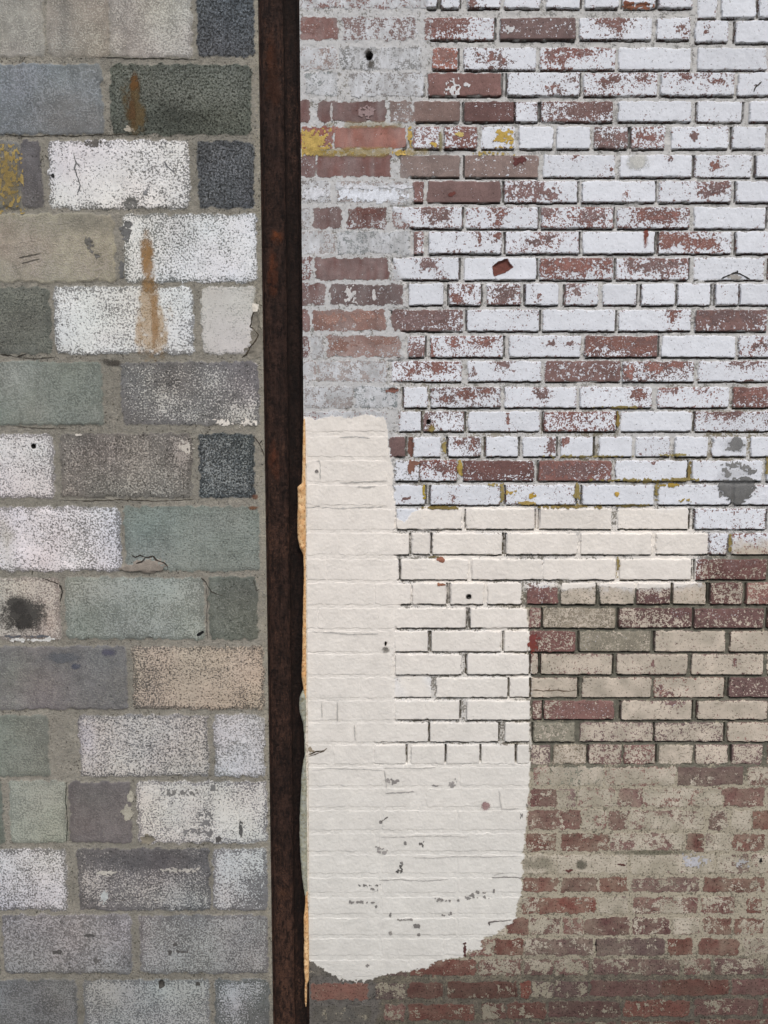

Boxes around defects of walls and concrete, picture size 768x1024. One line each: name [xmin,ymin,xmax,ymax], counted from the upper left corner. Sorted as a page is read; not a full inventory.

spalling [594,0,655,33]
rust [122,73,145,133]
peeling [697,160,730,198]
peeling [477,181,566,247]
rust [140,232,155,292]
spalling [492,258,518,304]
peeling [626,210,721,280]
peeling [440,369,492,403]
peeling [585,336,688,427]
peeling [401,412,700,510]
peeling [721,446,768,478]
damp [0,596,48,632]